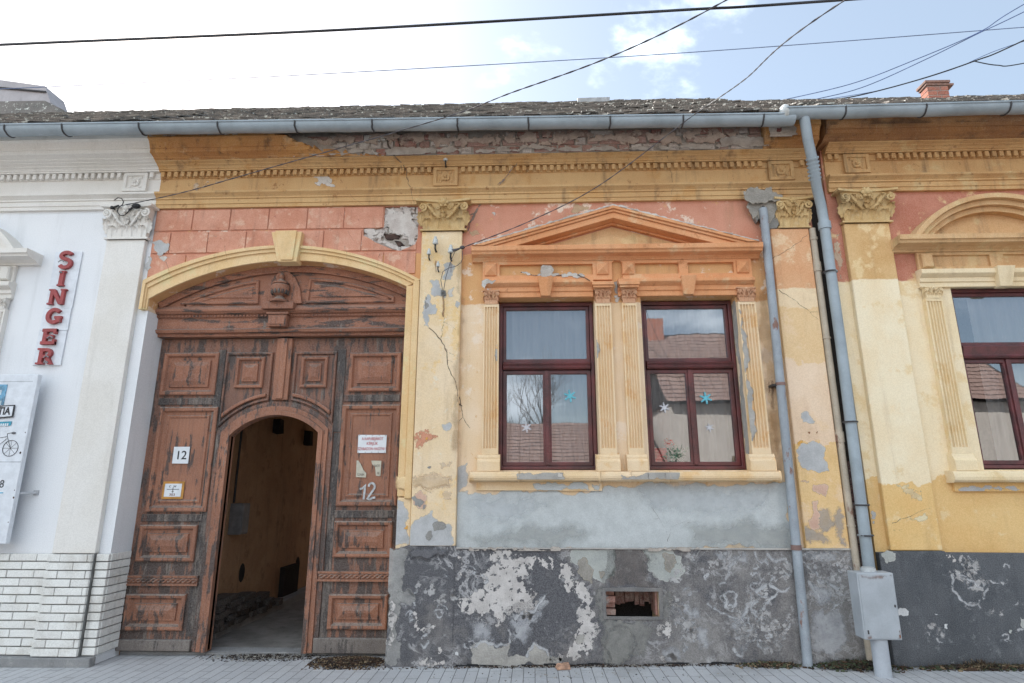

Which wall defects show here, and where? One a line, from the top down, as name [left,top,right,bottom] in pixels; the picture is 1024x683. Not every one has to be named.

spalling [282,125,798,158]
spalling [364,206,419,251]
peeling [743,187,783,227]
flaking render [145,240,170,271]
flaking render [422,262,460,326]
flaking render [522,265,585,278]
crack [429,314,470,428]
flaking render [796,411,846,545]
flaking render [396,462,791,584]
flaking render [470,630,561,666]